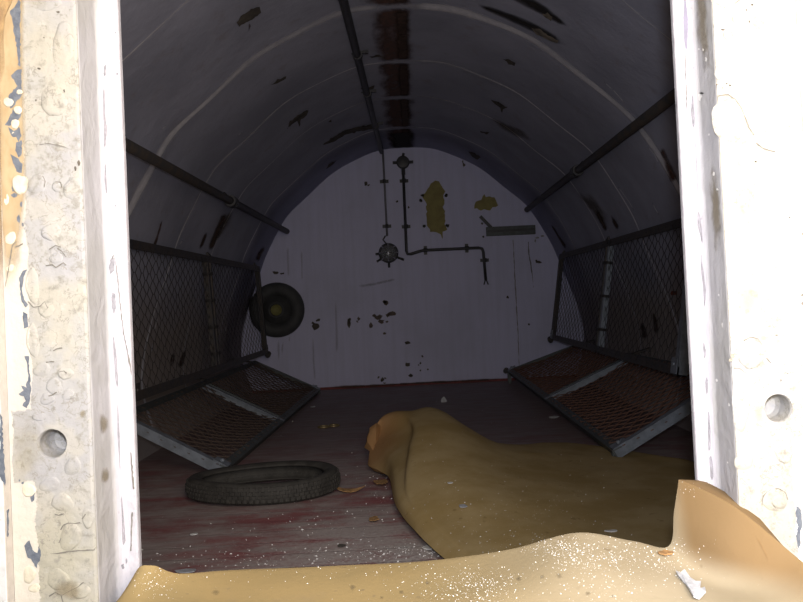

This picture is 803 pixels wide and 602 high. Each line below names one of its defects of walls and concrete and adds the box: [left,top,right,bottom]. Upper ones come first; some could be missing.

spalling [237,7,261,28]
spalling [482,6,559,43]
spalling [516,0,563,24]
peeling [5,0,23,173]
crack [718,94,776,153]
crack [5,241,23,286]
peeling [19,270,28,328]
peeling [369,300,396,335]
peeling [19,356,31,408]
peeling [24,541,41,568]